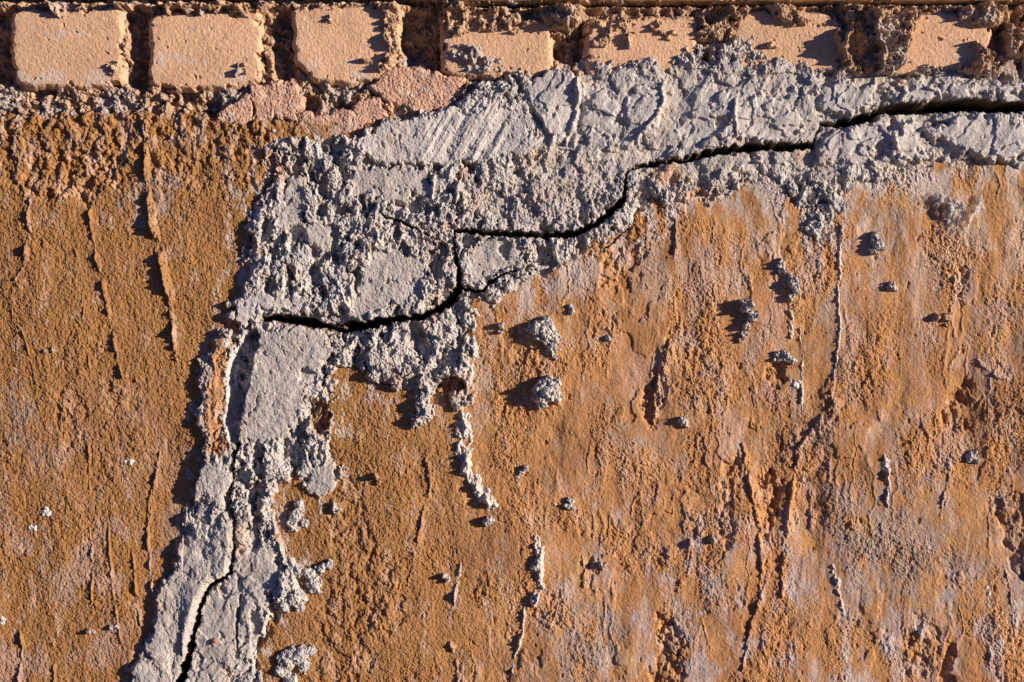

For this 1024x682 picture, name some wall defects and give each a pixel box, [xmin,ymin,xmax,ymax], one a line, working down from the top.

crack [258,97,1024,334]
crack [174,441,241,682]